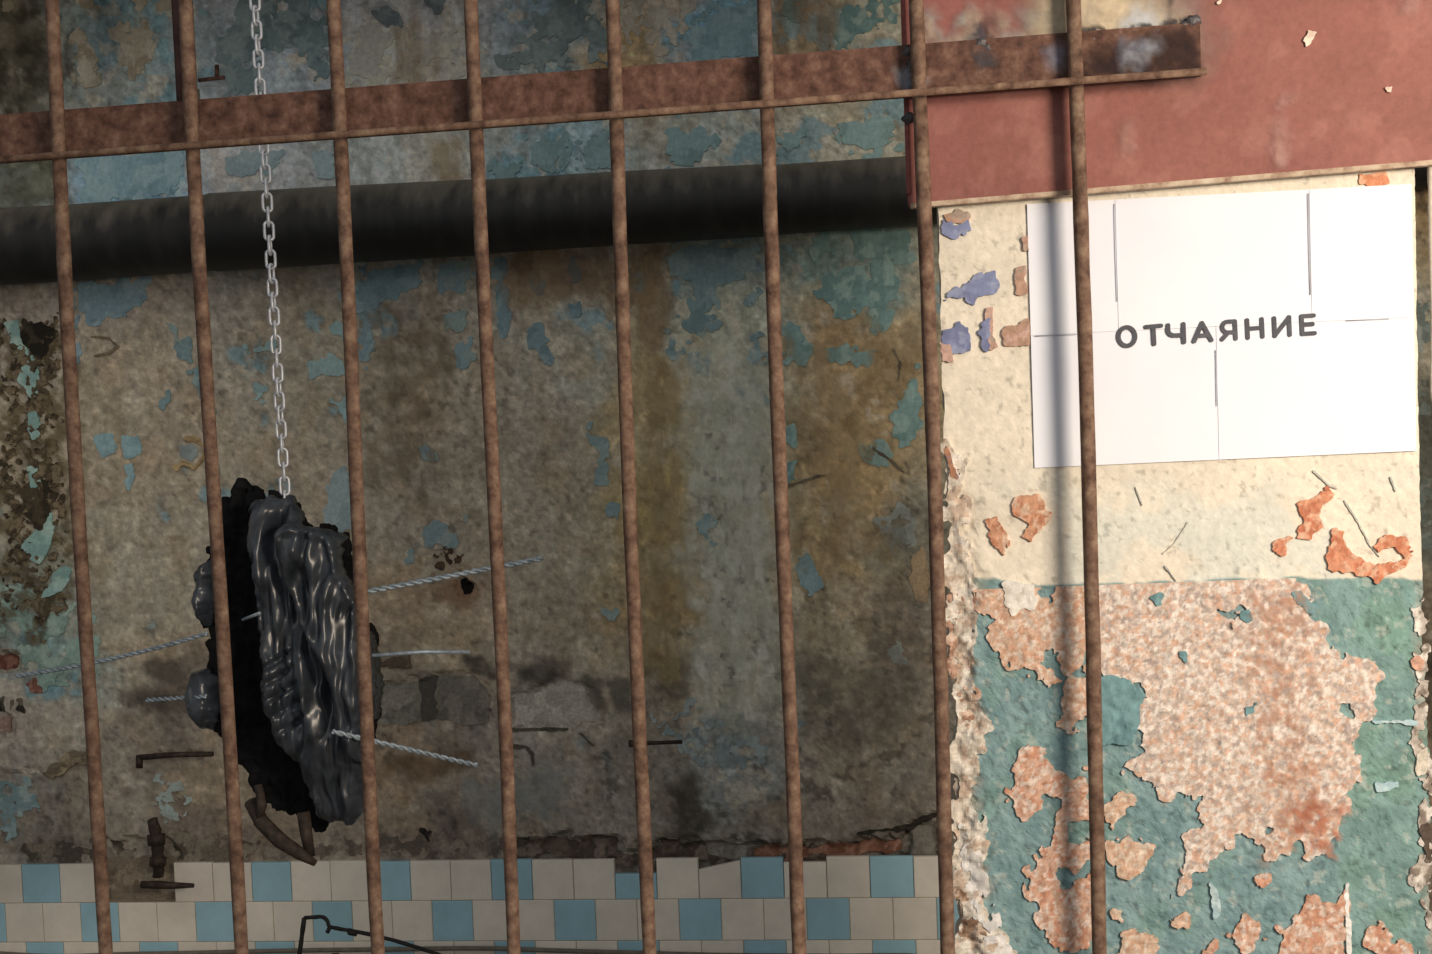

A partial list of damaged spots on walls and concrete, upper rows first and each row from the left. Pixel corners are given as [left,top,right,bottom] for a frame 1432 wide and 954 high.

peeling [214,0,466,97]
peeling [74,151,186,203]
peeling [729,228,917,416]
peeling [940,236,1030,363]
peeling [1416,300,1431,353]
peeling [0,275,153,737]
water stain [644,338,779,727]
water stain [463,655,493,677]
water stain [518,658,566,686]
water stain [582,676,630,709]
flaking render [379,438,1432,954]
water stain [669,775,711,846]